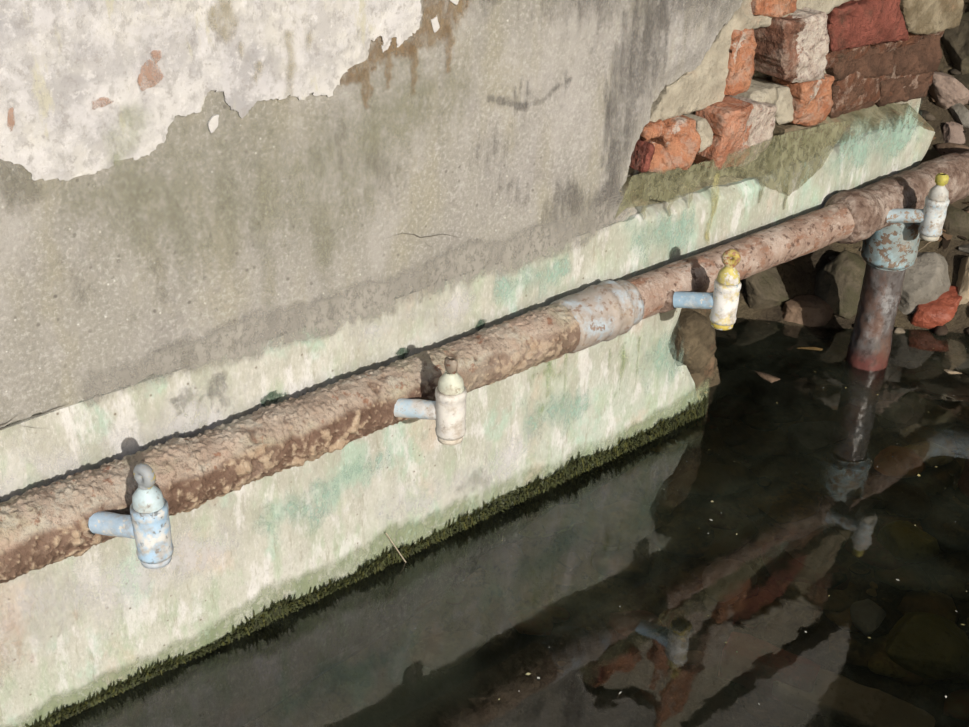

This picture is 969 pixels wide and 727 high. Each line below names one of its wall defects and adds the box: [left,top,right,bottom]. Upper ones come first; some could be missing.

peeling [0,0,440,181]
leakage [597,95,846,217]
spalling [629,0,964,174]